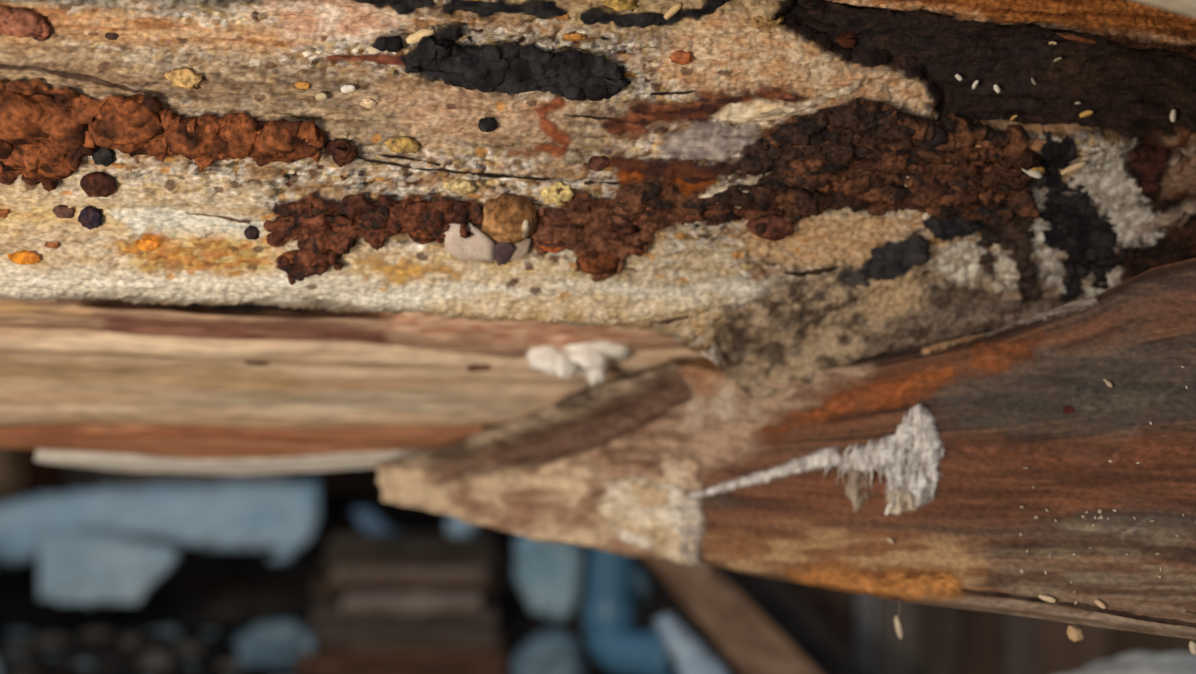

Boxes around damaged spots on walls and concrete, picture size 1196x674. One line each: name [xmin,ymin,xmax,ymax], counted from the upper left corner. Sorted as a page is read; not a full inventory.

leakage [354,0,731,102]
corrosion [602,86,806,139]
corrosion [608,155,735,197]
leakage [713,0,1196,353]
leakage [557,187,785,226]
corrosion [356,254,459,285]
leakage [145,303,327,312]
leakage [525,342,633,386]
leakage [686,404,944,515]